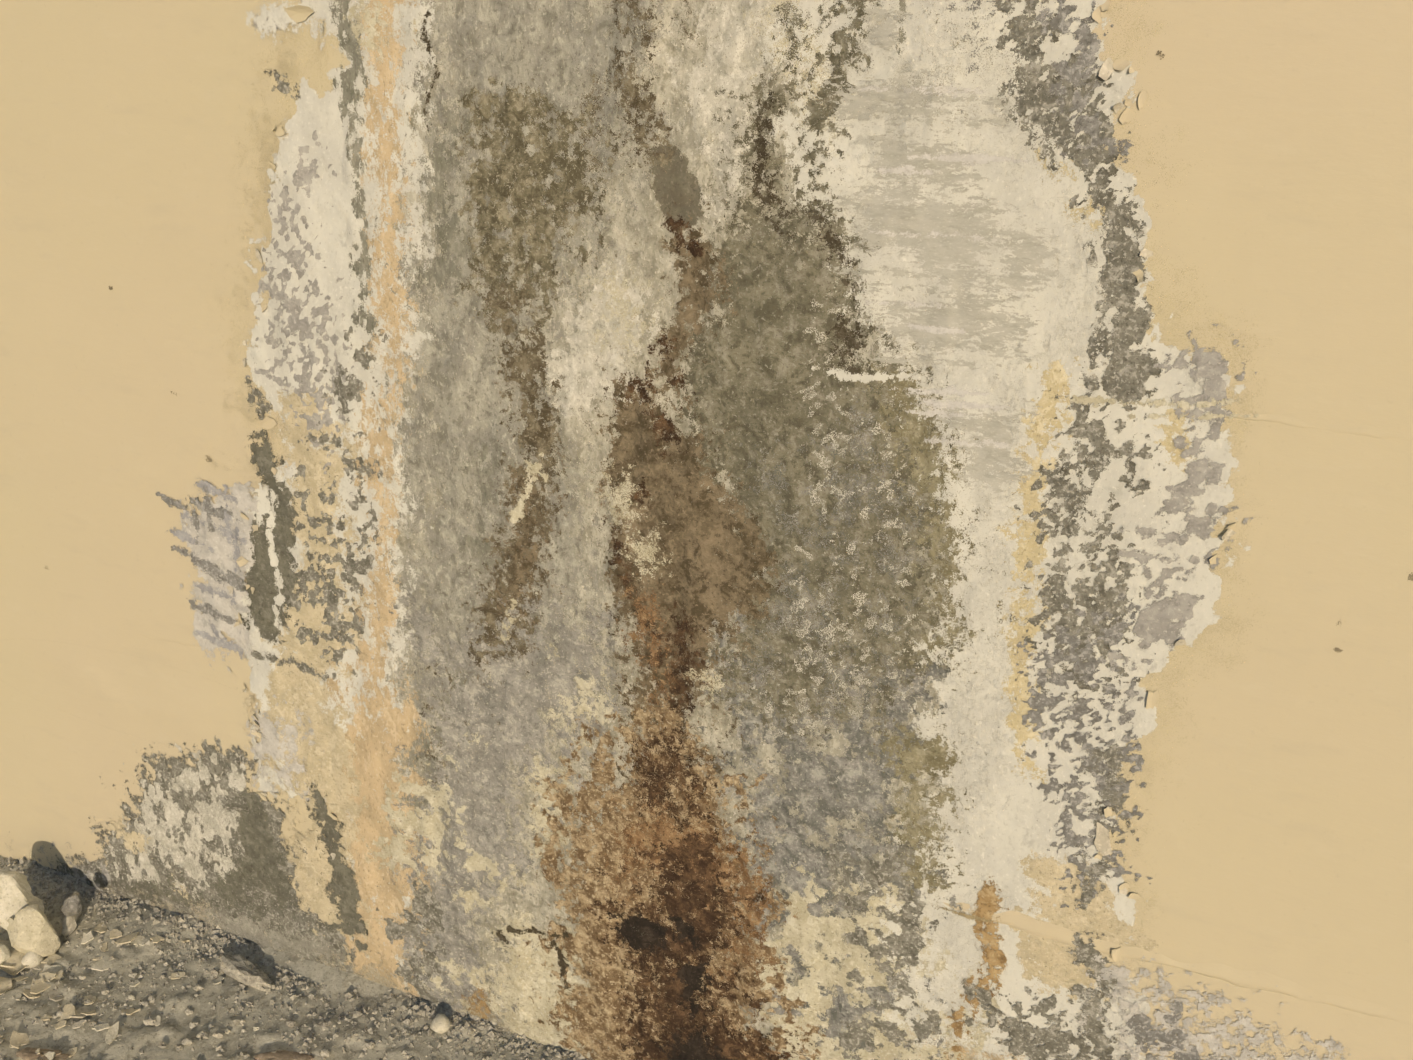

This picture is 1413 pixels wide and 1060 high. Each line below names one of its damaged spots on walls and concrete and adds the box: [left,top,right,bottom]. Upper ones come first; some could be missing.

damp [366,0,702,1031]
peeling [696,457,759,533]
damp [654,0,1038,1060]
corrosion [511,199,826,1060]
spalling [605,899,704,957]
spalling [635,958,737,1060]
peeling [734,987,785,1059]